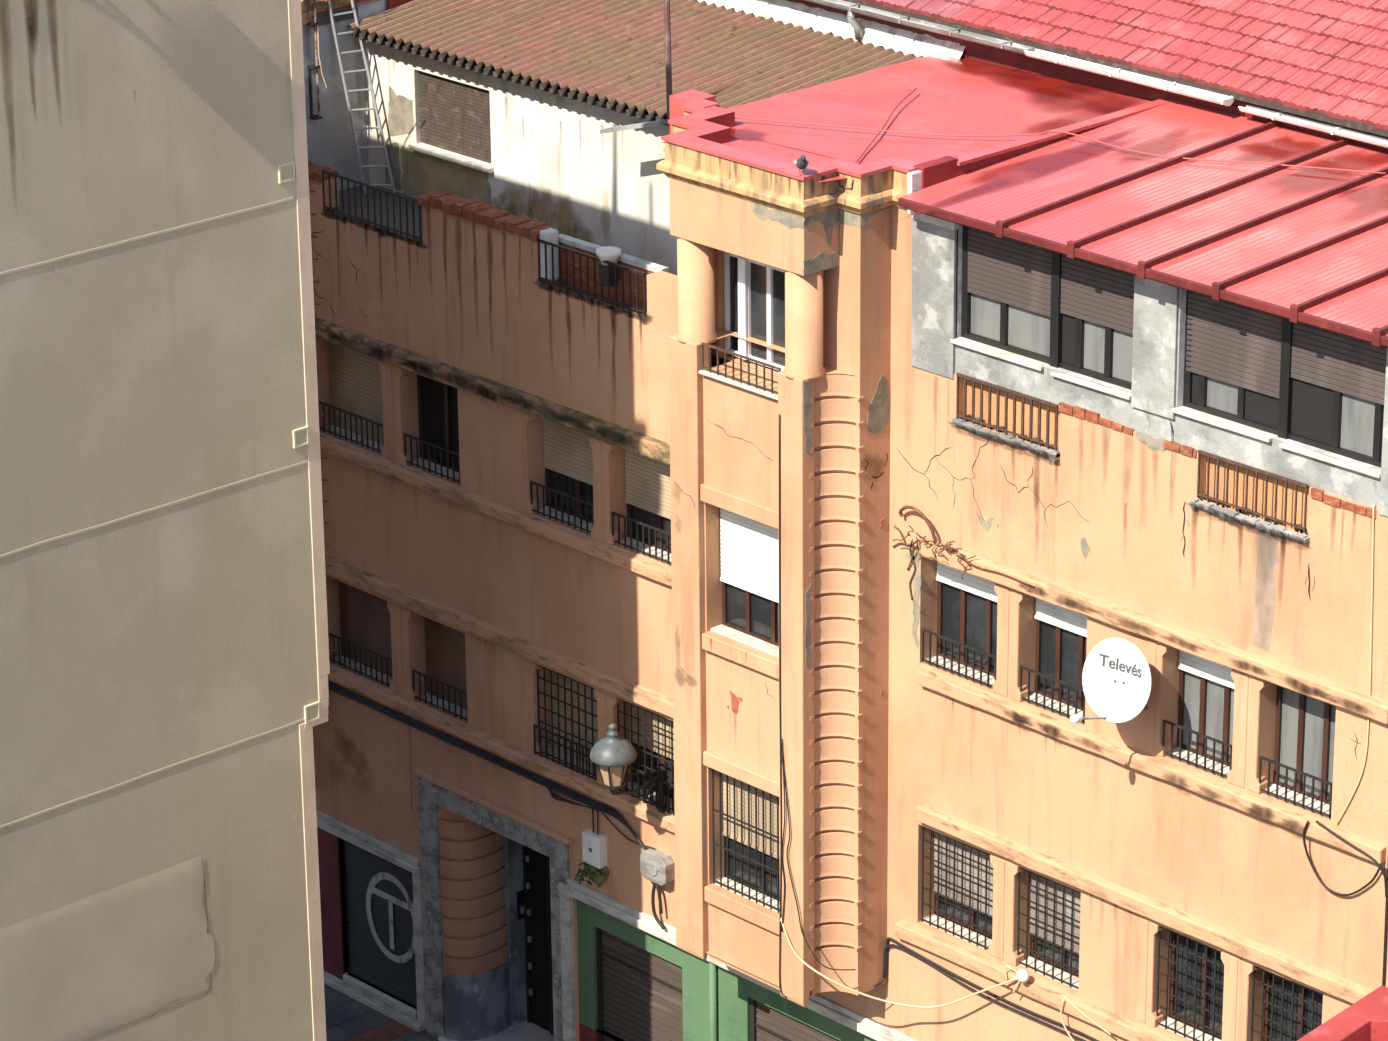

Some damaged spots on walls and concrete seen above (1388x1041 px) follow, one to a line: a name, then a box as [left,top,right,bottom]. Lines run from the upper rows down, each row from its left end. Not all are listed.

leakage [26,0,56,66]
leakage [323,209,426,248]
leakage [537,281,649,331]
leakage [404,359,531,408]
peeling [867,375,890,434]
crack [896,438,1087,528]
leakage [1189,503,1303,551]
leakage [1292,680,1325,698]